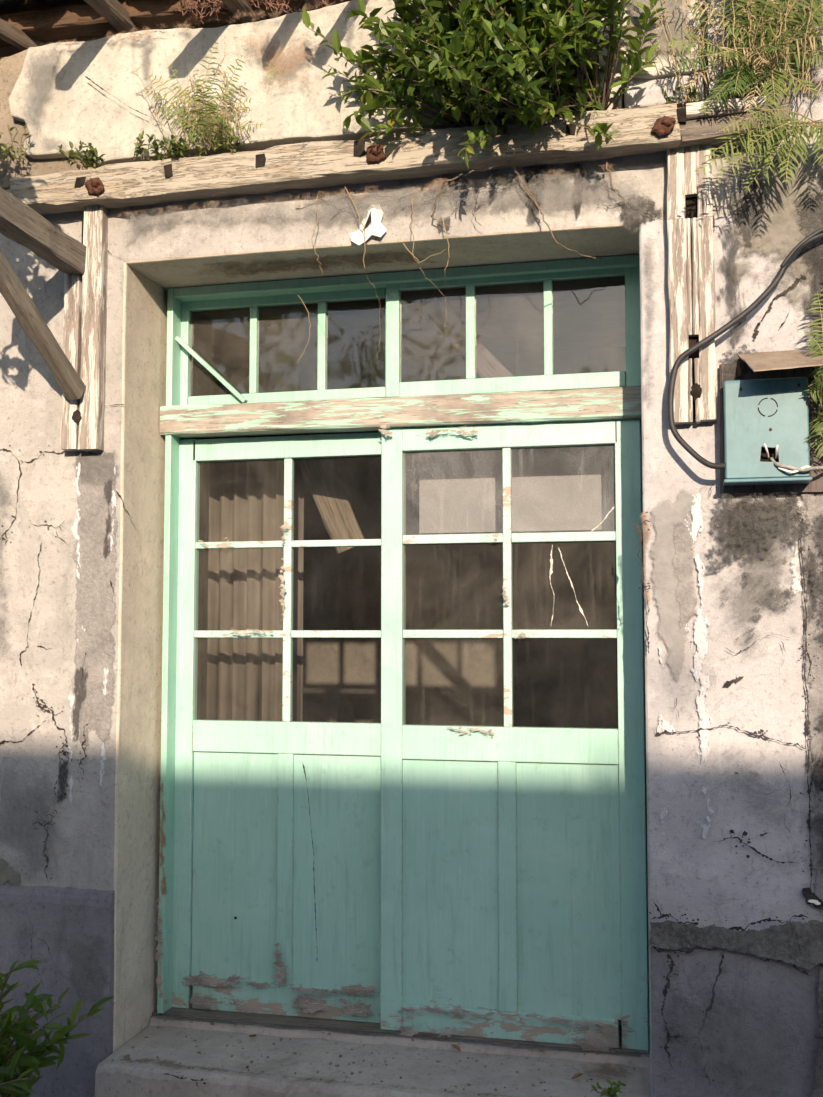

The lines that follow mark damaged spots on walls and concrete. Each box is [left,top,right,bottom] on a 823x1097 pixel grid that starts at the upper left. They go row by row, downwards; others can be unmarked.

water stain [720,147,823,393]
peeling [418,425,479,438]
crack [0,445,87,885]
flaking render [73,452,118,746]
water stain [655,714,675,736]
crack [654,518,823,890]
water stain [685,491,823,764]
peeling [181,943,378,1020]
peeling [395,1004,495,1038]
crack [659,954,724,1086]